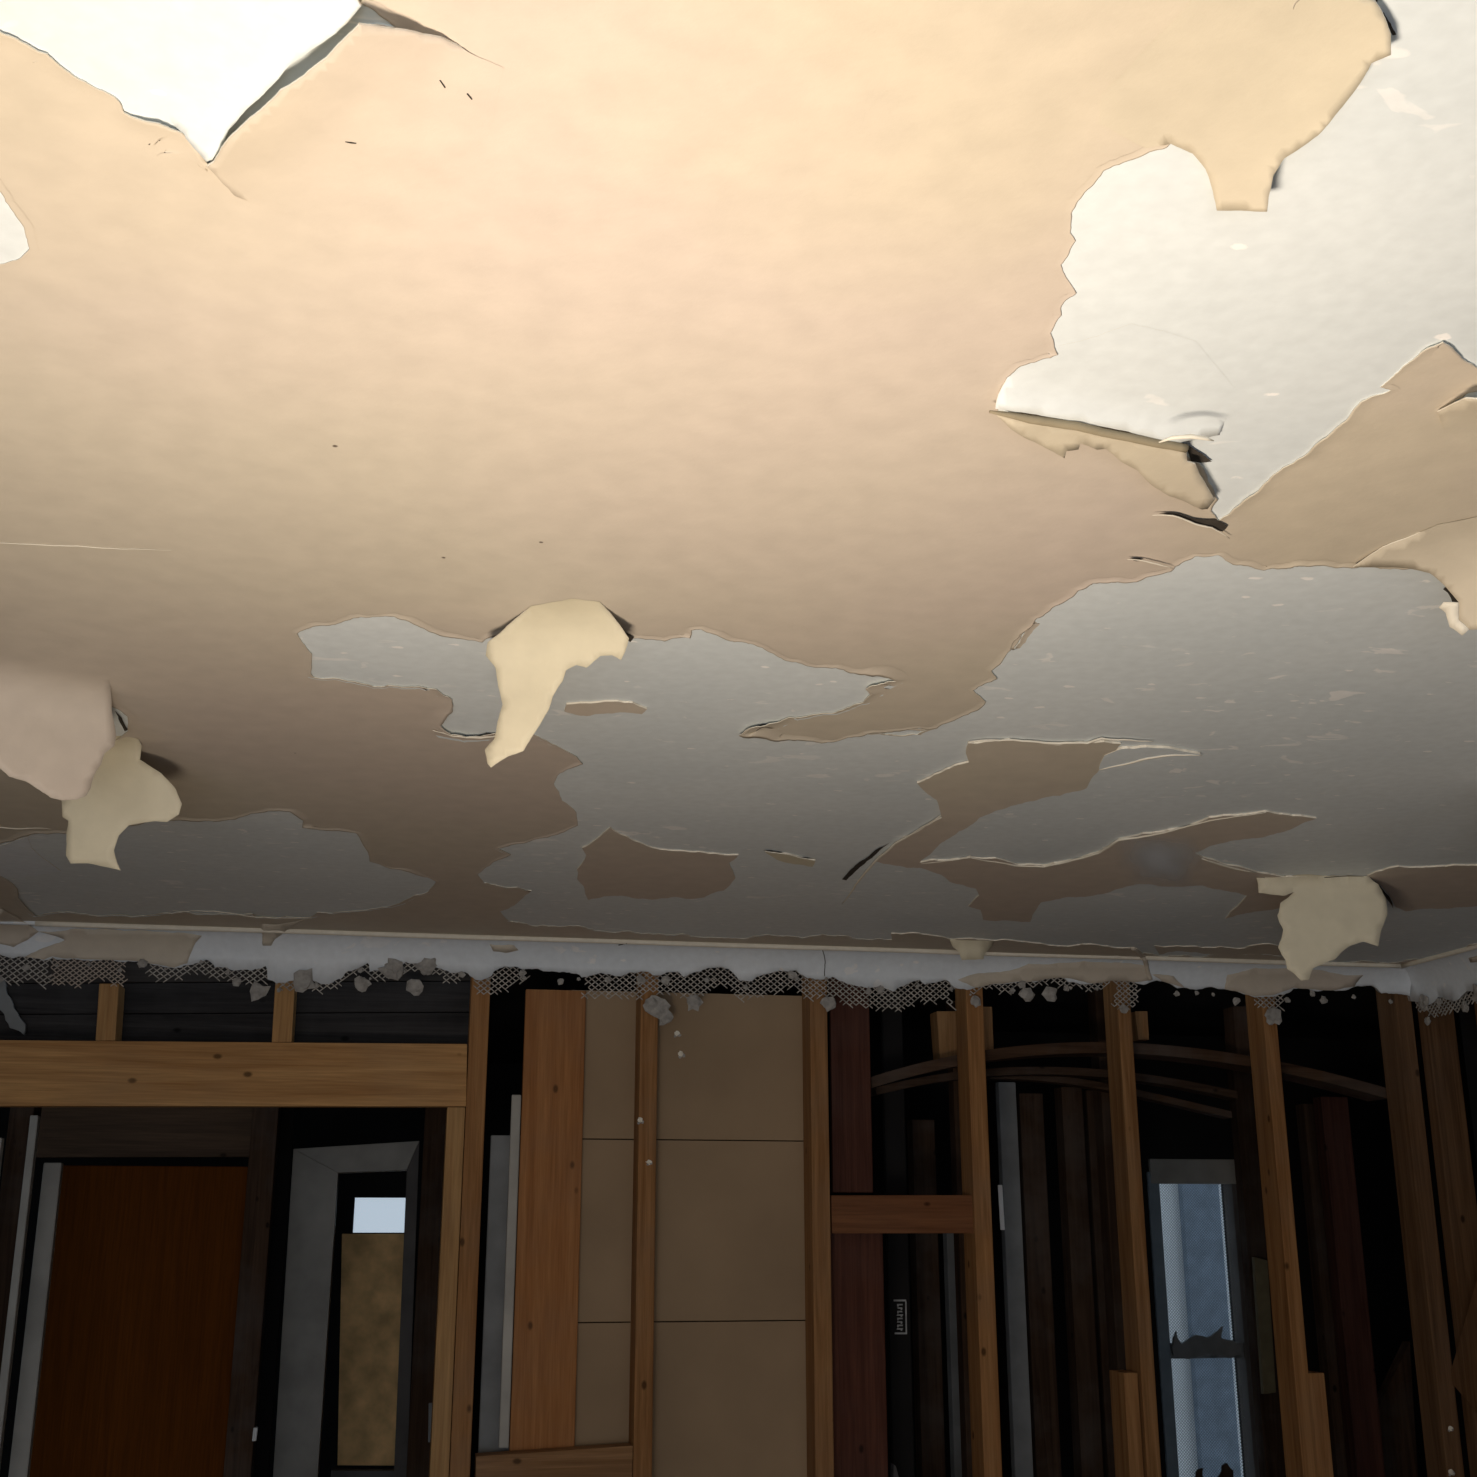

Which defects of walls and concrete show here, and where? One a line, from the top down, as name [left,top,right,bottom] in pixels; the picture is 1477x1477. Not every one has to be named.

peeling [0,180,39,269]
peeling [0,0,503,227]
peeling [989,0,1477,523]
peeling [0,627,530,1002]
peeling [290,517,1477,1026]